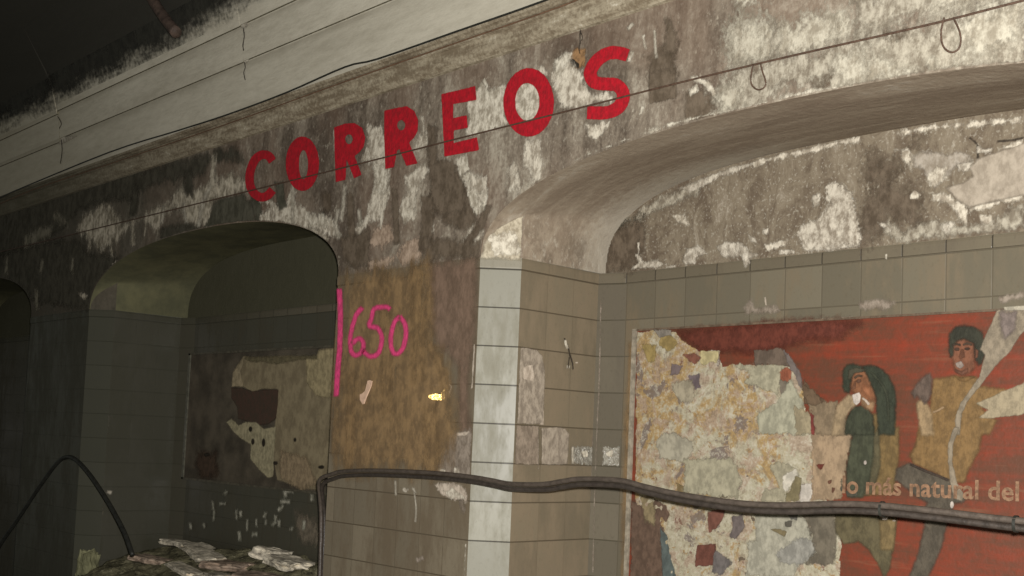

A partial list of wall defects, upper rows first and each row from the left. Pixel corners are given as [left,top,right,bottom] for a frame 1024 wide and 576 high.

leakage [466,78,539,137]
leakage [538,52,612,110]
leakage [585,121,610,139]
leakage [505,139,542,193]
spalling [621,137,860,226]
leakage [865,148,971,199]
flaking render [897,116,1024,224]
leakage [880,204,1024,244]